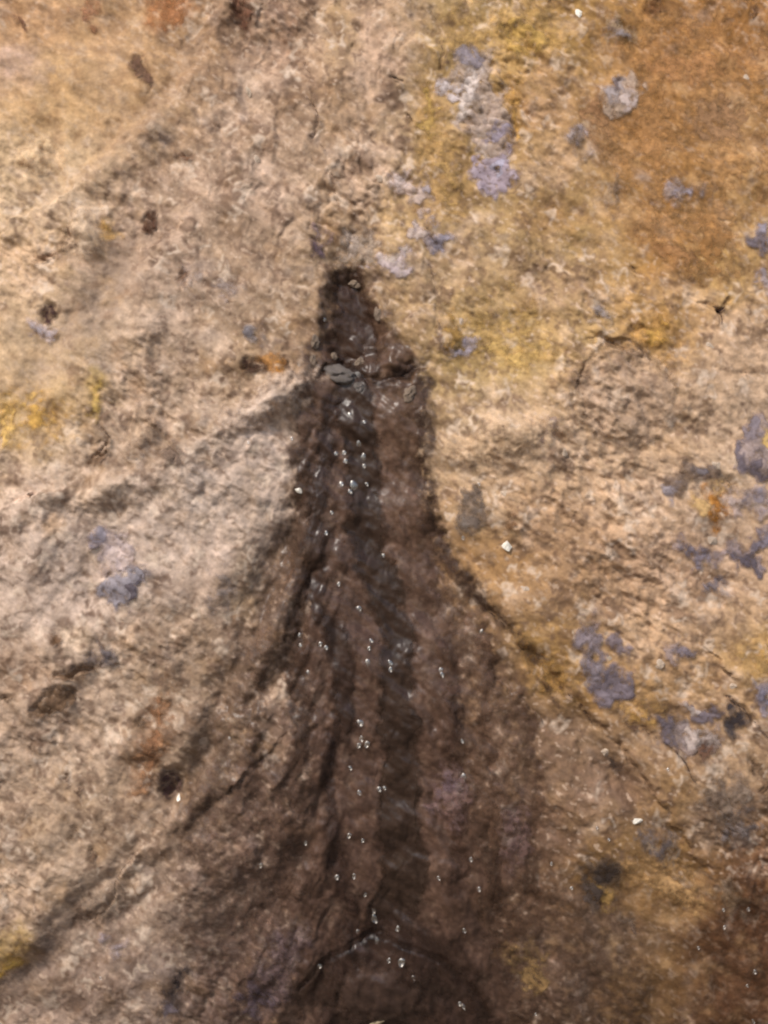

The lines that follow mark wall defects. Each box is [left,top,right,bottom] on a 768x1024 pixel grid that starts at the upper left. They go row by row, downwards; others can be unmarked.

water stain [175,262,649,1024]
water stain [620,851,711,916]